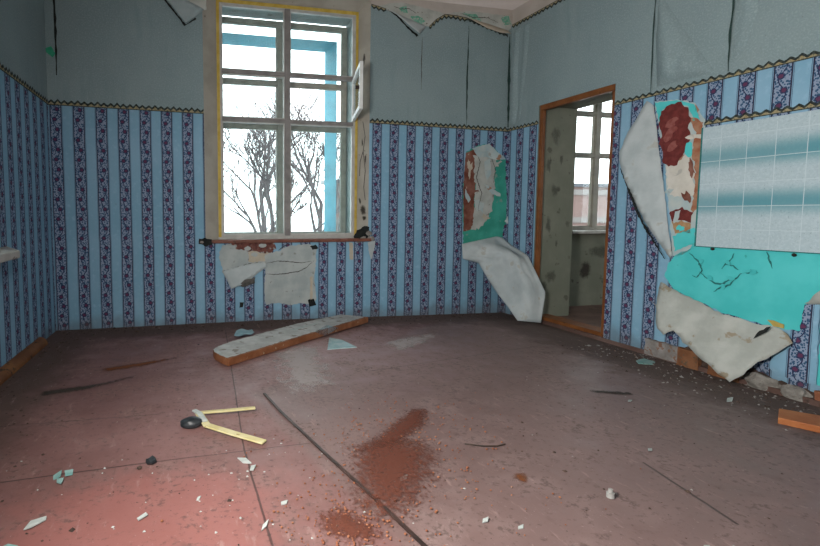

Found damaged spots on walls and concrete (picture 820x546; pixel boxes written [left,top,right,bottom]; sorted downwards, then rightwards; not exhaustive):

peeling [164,0,207,26]
flaking render [219,243,318,307]
peeling [462,144,545,323]
peeling [619,99,820,402]
crack [691,252,772,292]